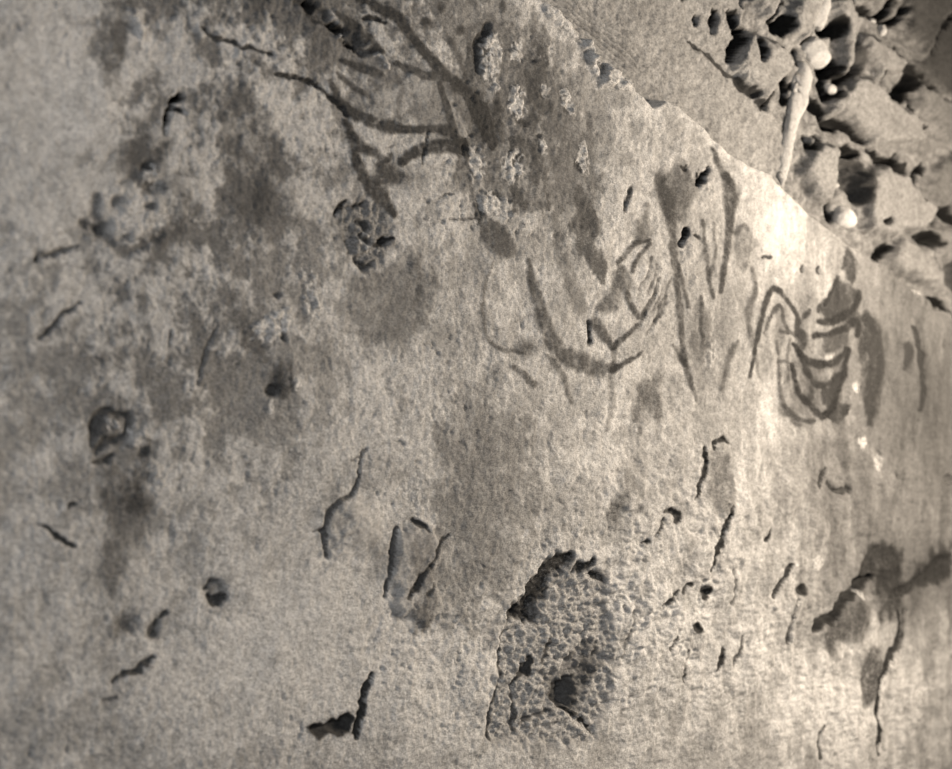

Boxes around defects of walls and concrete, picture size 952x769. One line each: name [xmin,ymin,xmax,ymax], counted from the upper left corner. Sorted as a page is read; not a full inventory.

leakage [265,363,293,399]
leakage [859,313,884,426]
leakage [904,325,927,411]
crack [312,448,367,557]
crack [383,517,450,600]
spalling [307,672,373,740]
leakage [860,647,883,707]
crack [874,608,903,756]